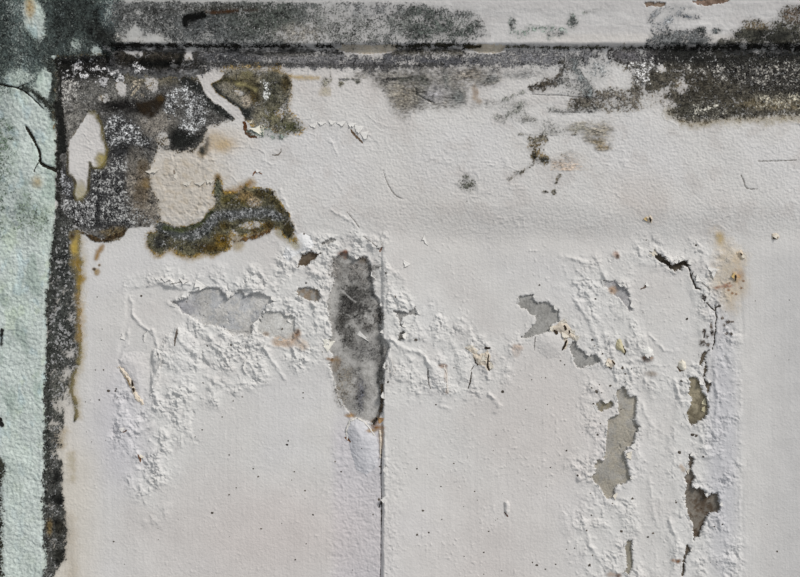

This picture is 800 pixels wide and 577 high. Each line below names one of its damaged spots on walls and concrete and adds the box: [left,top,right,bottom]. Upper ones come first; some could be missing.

crack [0,83,43,108]
water stain [528,5,800,125]
crack [25,126,57,173]
peeling [154,277,295,341]
water stain [0,0,578,577]
peeling [295,252,390,426]
peeling [517,294,615,369]
crack [687,266,720,350]
peeling [683,350,712,426]
peeling [591,385,642,499]
crack [376,450,384,525]
peeling [680,452,723,576]